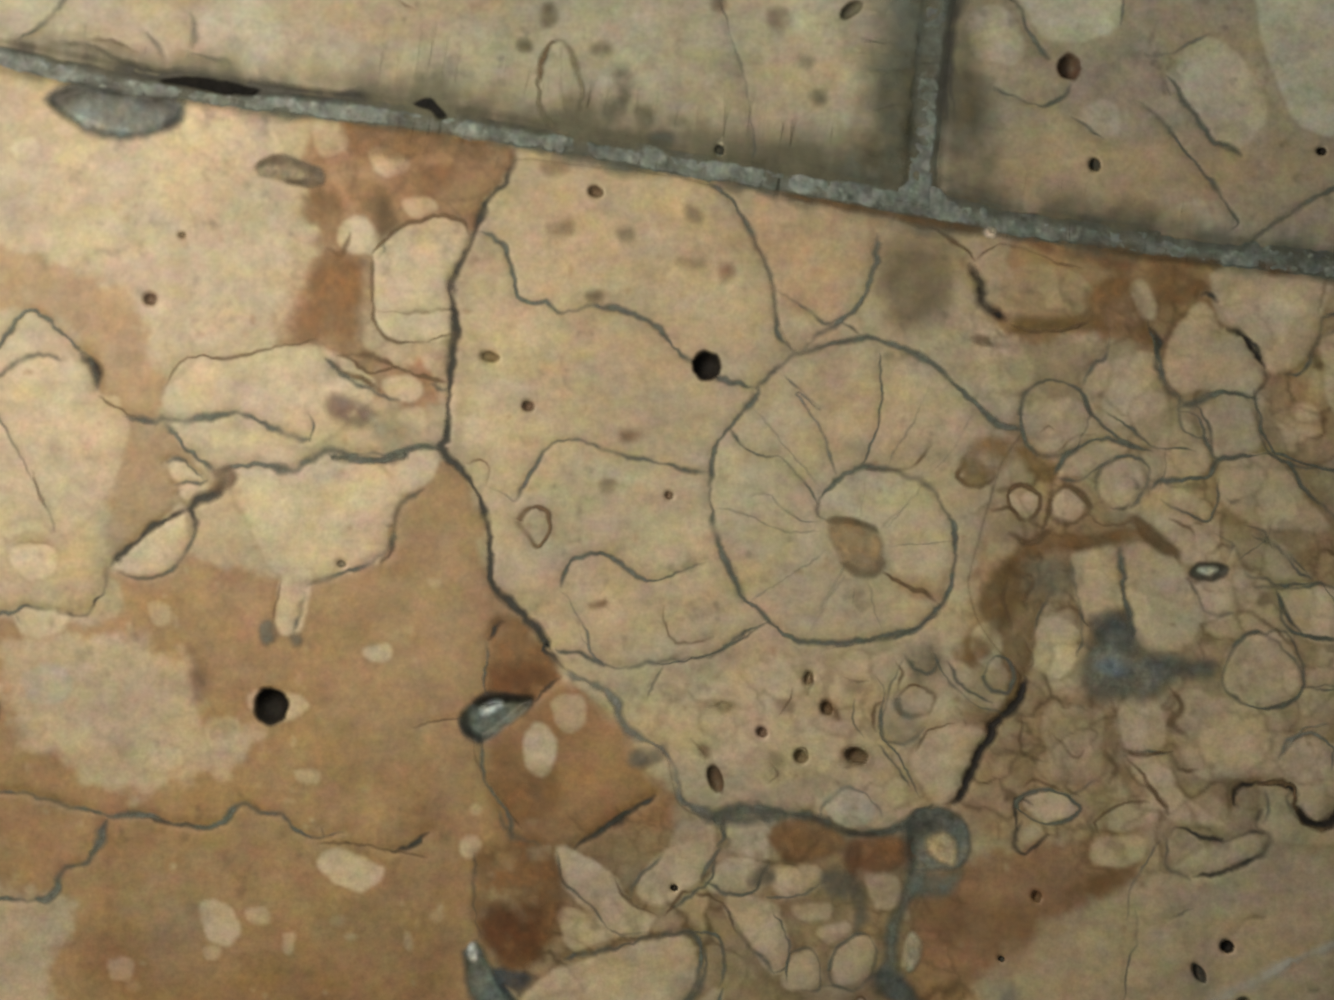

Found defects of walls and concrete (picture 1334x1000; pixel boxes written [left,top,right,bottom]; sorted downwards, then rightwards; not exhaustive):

damp [793,195,868,210]
damp [898,215,971,231]
crack [1169,79,1334,236]
crack [930,227,1084,332]
crack [1233,329,1261,363]
crack [0,175,668,756]
crack [956,357,1334,545]
crack [1118,555,1135,634]
crack [1233,563,1334,647]
crack [1013,670,1334,877]
crack [0,807,163,903]
crack [558,655,1026,1000]